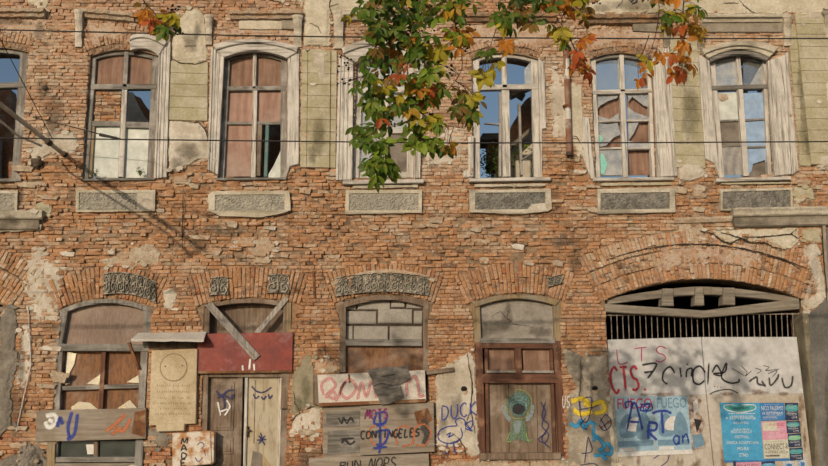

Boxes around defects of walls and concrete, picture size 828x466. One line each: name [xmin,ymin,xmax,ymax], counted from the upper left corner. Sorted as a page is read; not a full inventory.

peeling [0,0,50,42]
spalling [0,66,623,466]
peeling [656,160,826,314]